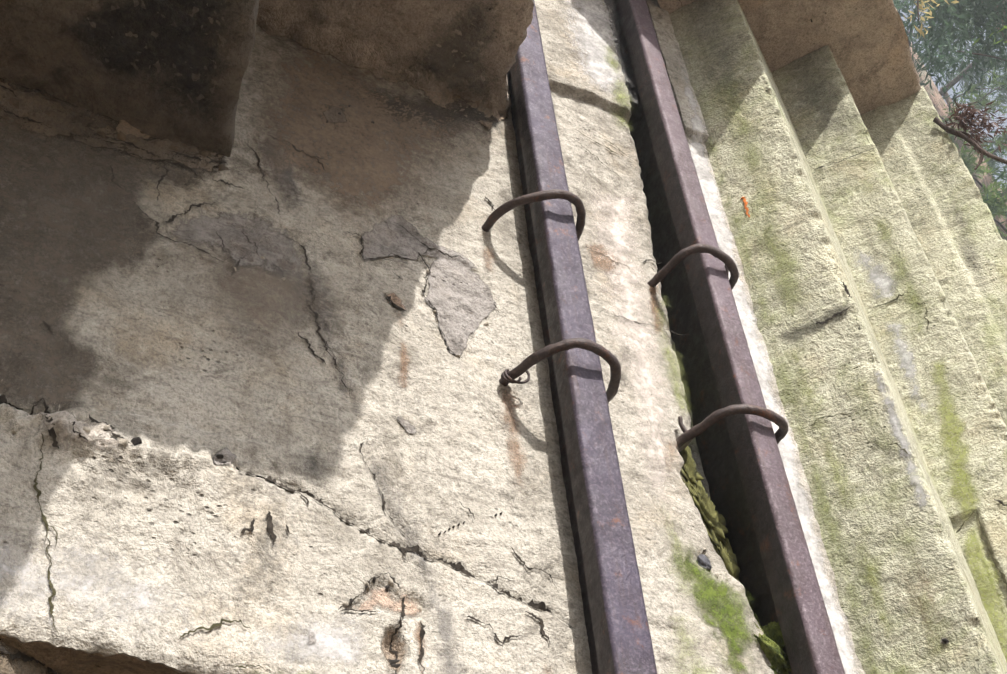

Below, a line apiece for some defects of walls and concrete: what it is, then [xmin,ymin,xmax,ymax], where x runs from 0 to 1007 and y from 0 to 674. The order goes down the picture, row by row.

water stain [72,0,231,119]
water stain [0,78,222,411]
crack [110,135,350,395]
peeling [386,220,496,358]
crack [0,395,59,634]
crack [179,618,250,639]
spalling [338,572,426,673]
crack [219,437,575,644]